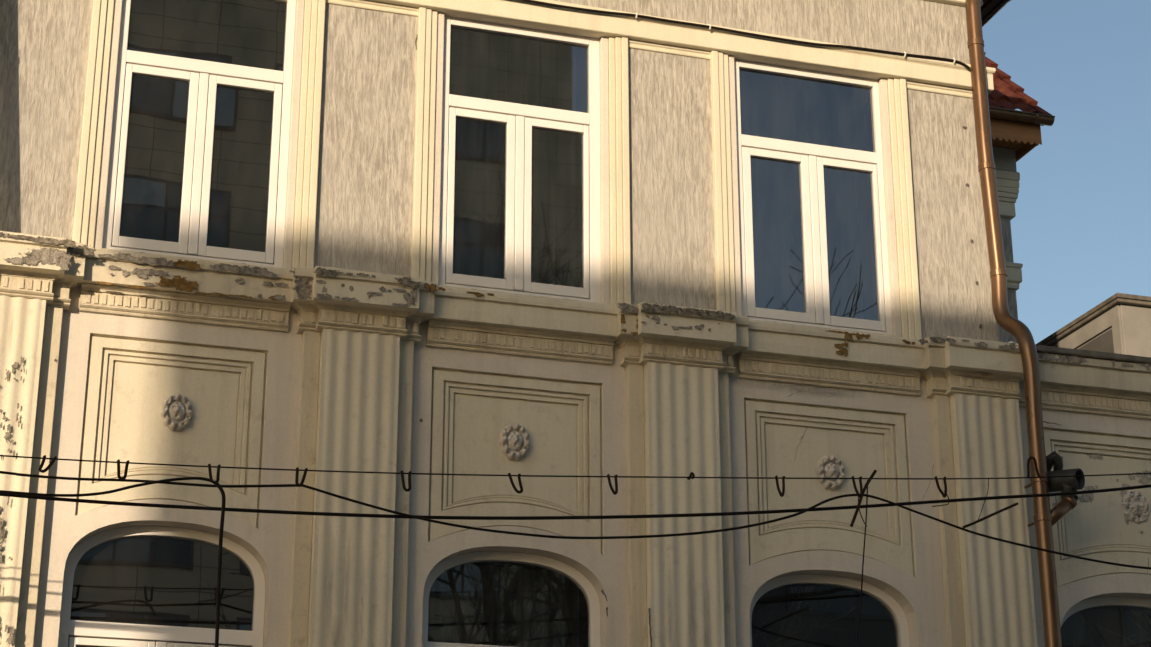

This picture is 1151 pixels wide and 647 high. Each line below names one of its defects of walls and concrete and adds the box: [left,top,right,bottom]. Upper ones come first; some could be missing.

peeling [0,232,186,289]
corrosion [152,259,201,292]
peeling [195,263,445,307]
spalling [618,302,736,331]
corrosion [826,330,870,356]
peeling [0,355,25,387]
peeling [0,400,20,460]
peeling [0,497,11,562]